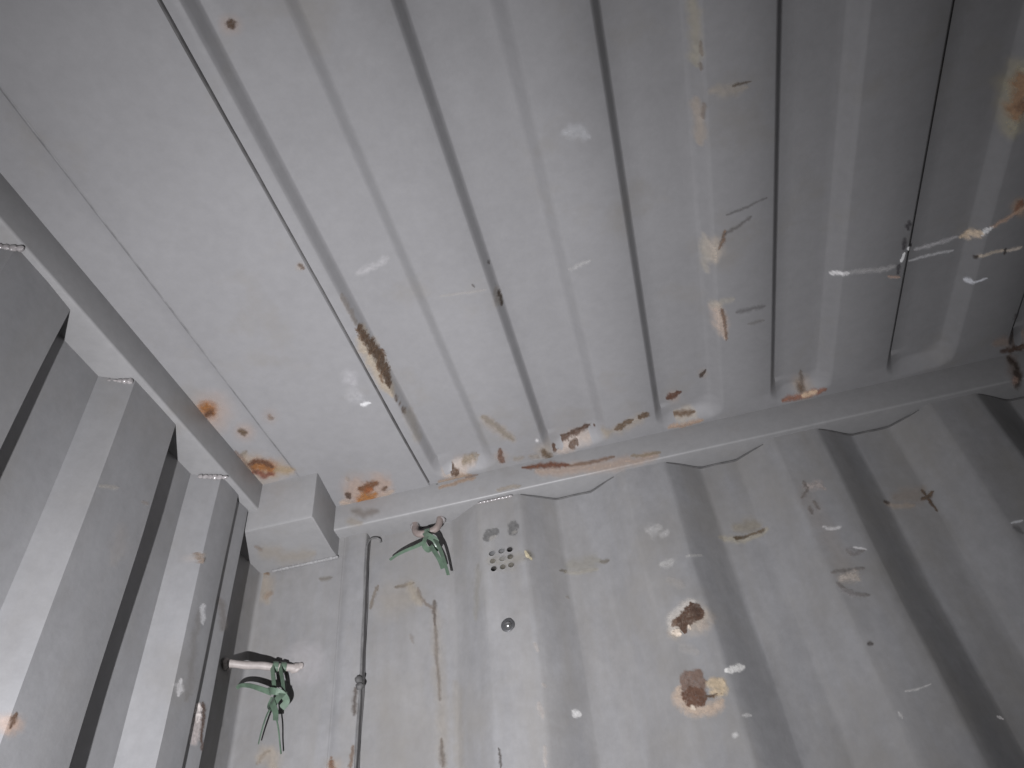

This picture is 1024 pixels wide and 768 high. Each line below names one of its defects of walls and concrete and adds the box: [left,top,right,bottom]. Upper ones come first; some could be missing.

peeling [960,227,994,238]
rust [1001,315,1024,388]
rust [782,370,826,402]
rust [200,403,215,417]
rust [248,459,275,478]
rust [522,449,615,469]
rust [345,482,387,502]